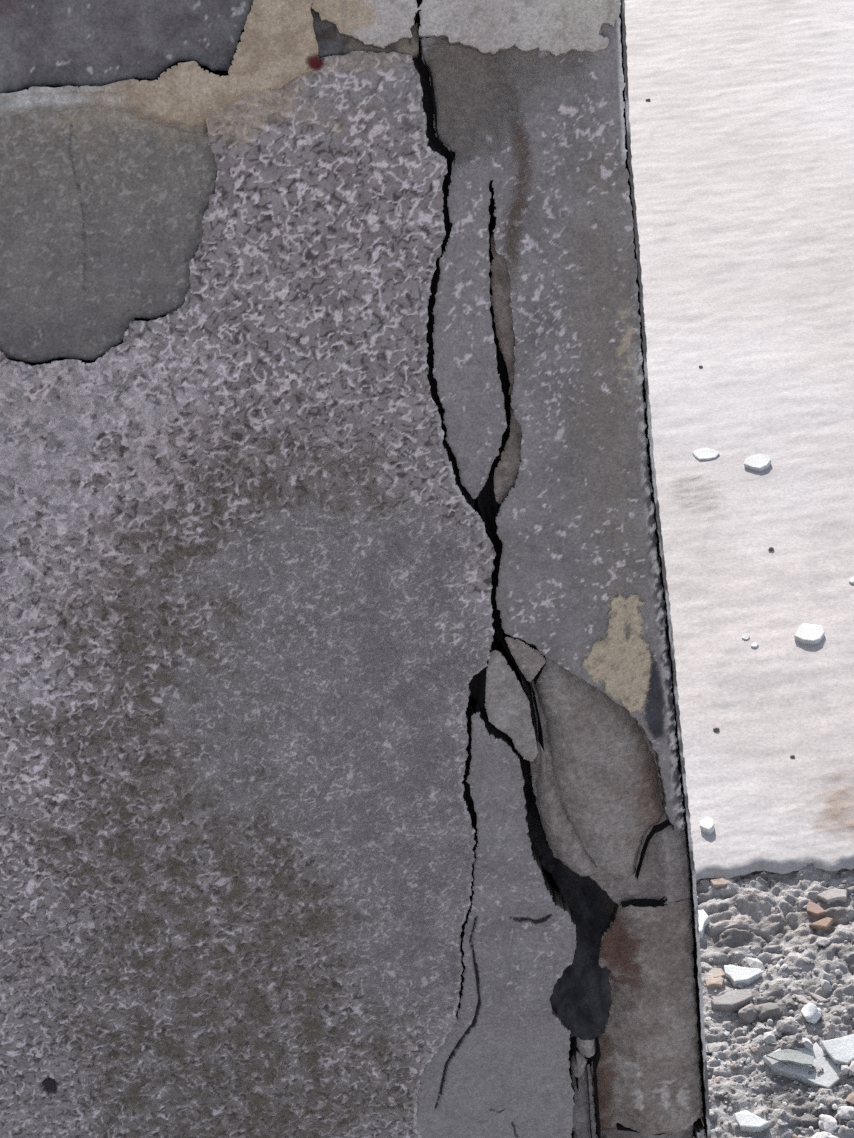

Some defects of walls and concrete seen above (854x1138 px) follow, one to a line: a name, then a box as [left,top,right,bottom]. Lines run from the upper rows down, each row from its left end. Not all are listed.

spalling [0,0,253,94]
spalling [311,11,507,157]
spalling [0,106,217,363]
crack [410,0,552,1108]
crack [621,249,707,1137]
spalling [484,594,763,1138]
crack [569,1036,666,1138]
spalling [734,1110,769,1132]